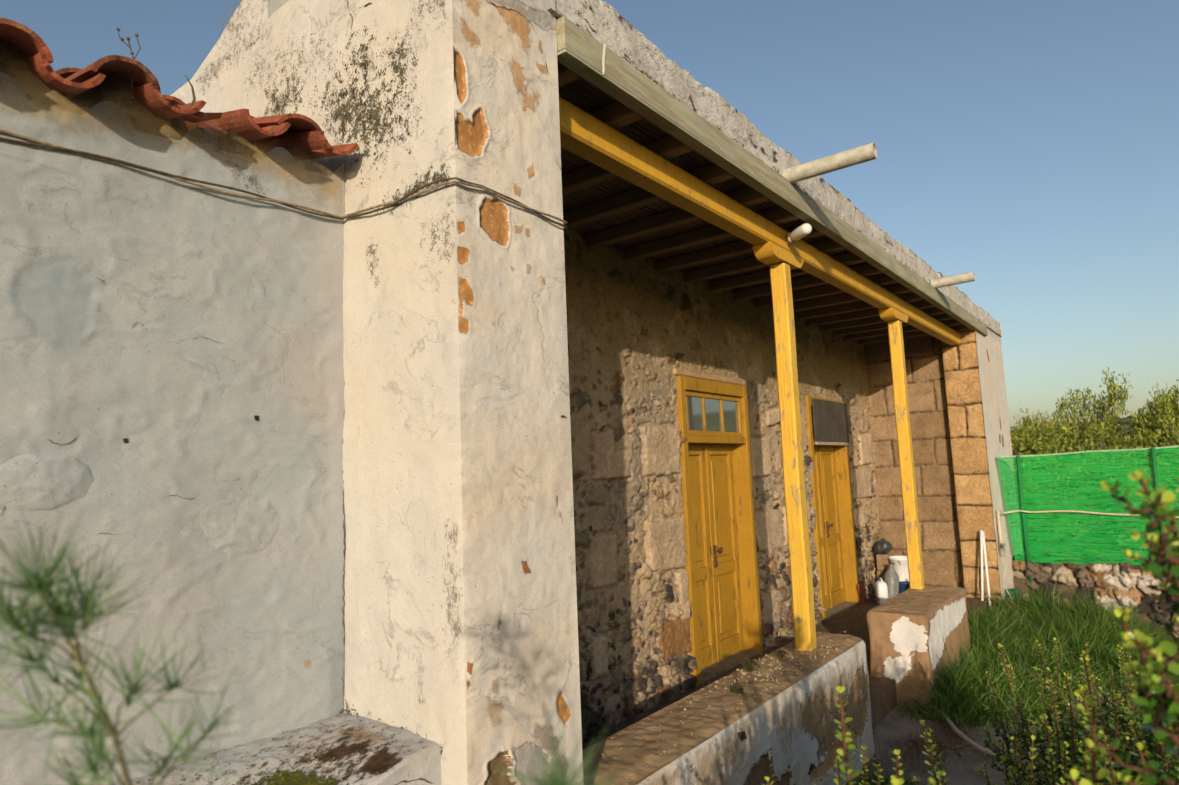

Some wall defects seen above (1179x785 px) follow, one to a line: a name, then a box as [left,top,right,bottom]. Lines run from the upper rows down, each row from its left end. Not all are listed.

water stain [2,63,91,121]
water stain [192,0,446,193]
peeling [454,0,556,157]
water stain [374,162,450,215]
peeling [514,163,534,197]
peeling [480,198,530,246]
peeling [458,221,474,334]
flaking render [883,597,966,683]
flaking render [800,662,869,782]
spalling [484,742,549,785]
spalling [745,749,795,785]